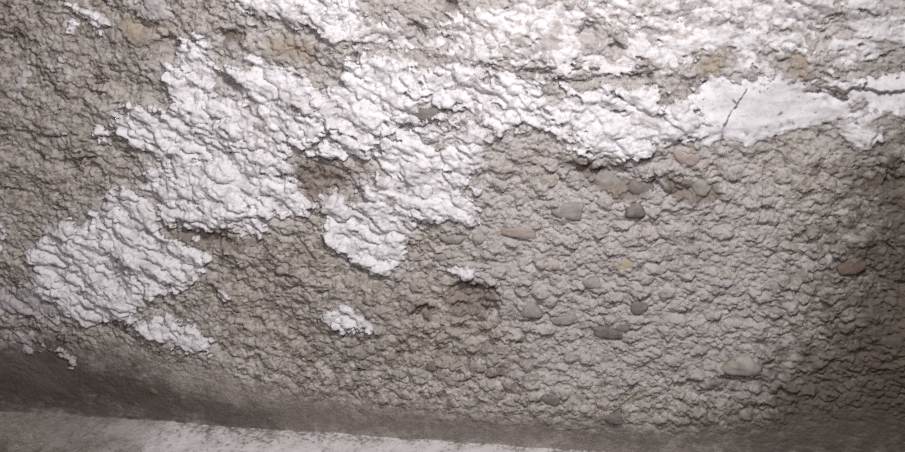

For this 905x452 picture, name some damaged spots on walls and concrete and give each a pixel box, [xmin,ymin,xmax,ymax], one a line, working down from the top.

damp [16,0,182,64]
damp [0,45,84,143]
crack [721,88,747,139]
crack [816,81,905,98]
damp [431,248,497,291]
damp [300,292,384,345]
damp [751,158,905,452]